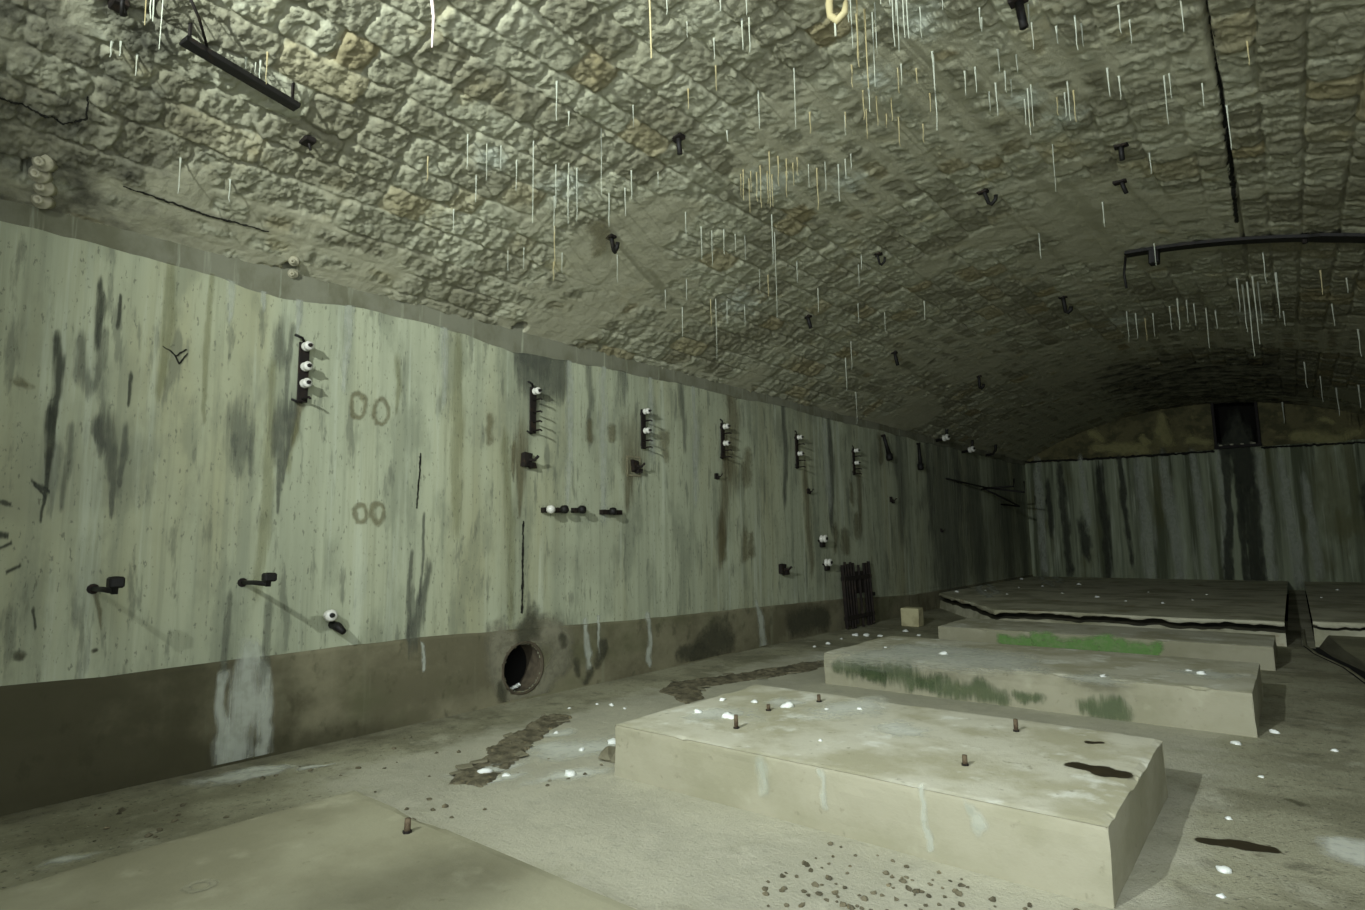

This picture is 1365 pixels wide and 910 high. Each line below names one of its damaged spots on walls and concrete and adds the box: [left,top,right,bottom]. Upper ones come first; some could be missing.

damp [95,279,122,348]
damp [40,333,65,522]
damp [94,418,127,517]
damp [272,403,296,512]
damp [515,353,569,404]
damp [1036,456,1133,587]
damp [1220,415,1266,581]